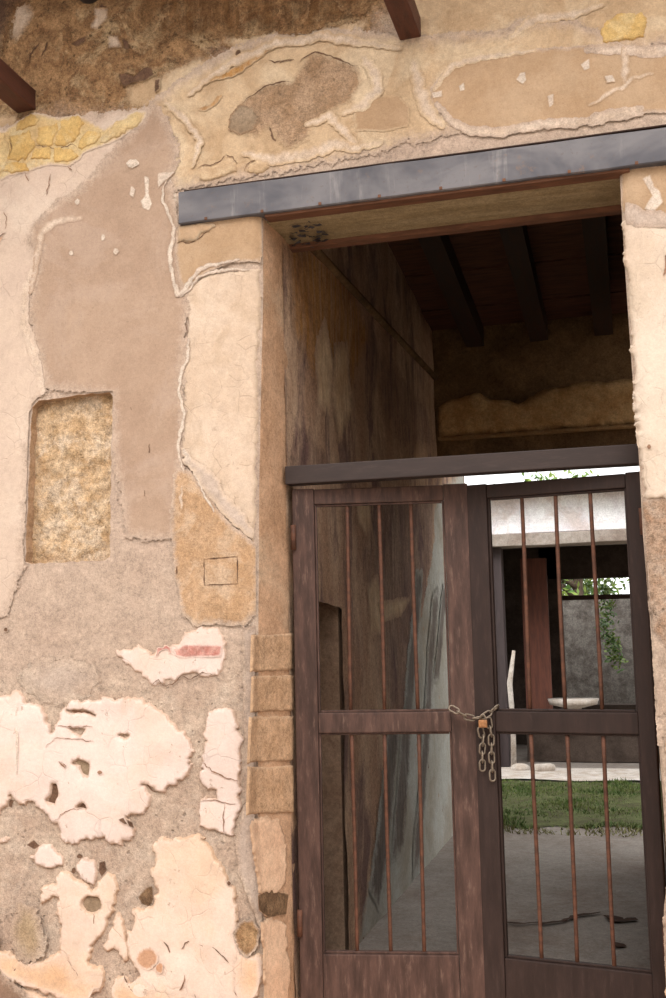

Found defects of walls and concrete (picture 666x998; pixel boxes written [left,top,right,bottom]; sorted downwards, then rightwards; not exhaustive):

crack [587,46,654,107]
flaking render [0,0,666,711]
flaking render [620,165,666,814]
spalling [0,626,294,998]
flaking render [359,731,453,944]